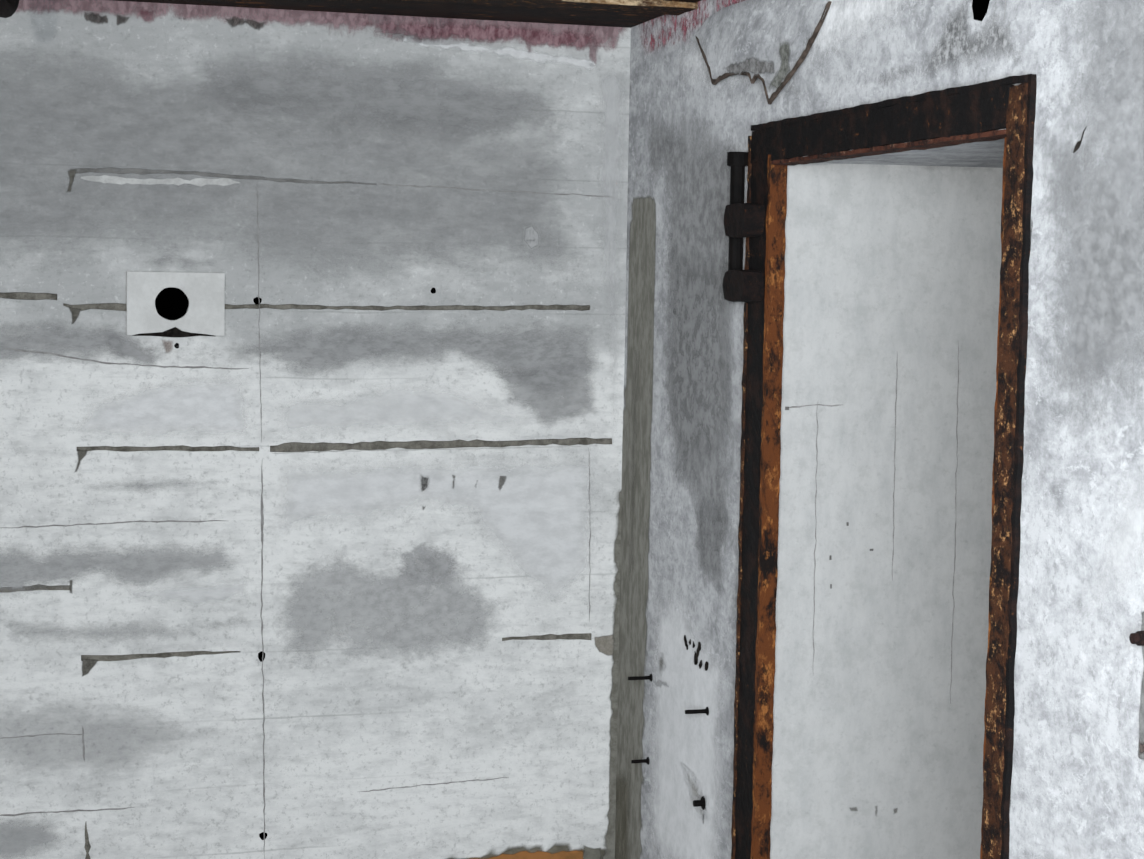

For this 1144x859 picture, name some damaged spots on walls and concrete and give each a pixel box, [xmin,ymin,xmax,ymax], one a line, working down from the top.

damp [220,65,535,128]
damp [0,327,152,363]
spalling [132,327,214,337]
damp [261,329,590,421]
damp [651,127,731,580]
spalling [448,197,656,859]